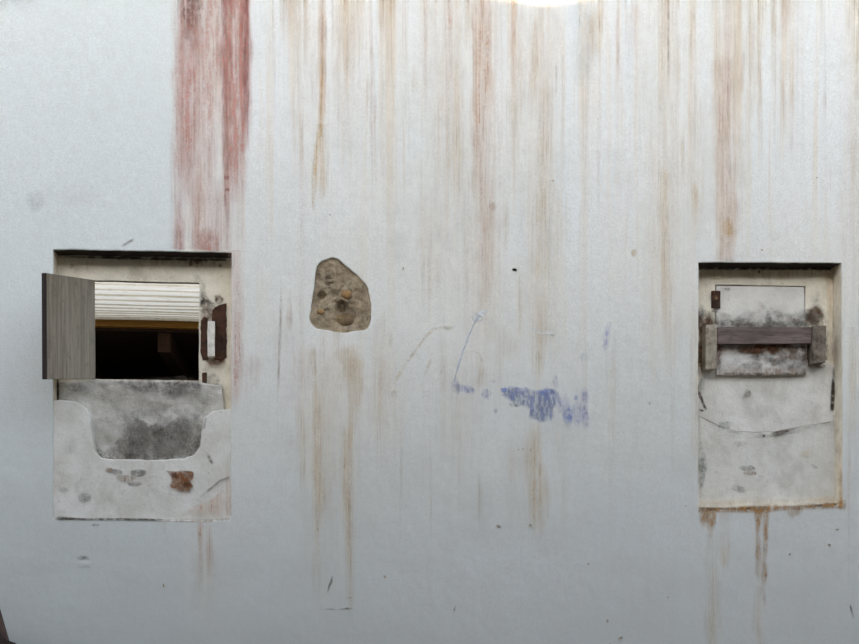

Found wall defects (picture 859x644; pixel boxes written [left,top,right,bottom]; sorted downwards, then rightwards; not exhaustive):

corrosion [222,0,248,204]
flaking render [309,258,371,333]
leakage [698,311,816,327]
crack [760,429,795,437]
corrosion [167,471,193,491]
corrosion [702,506,786,540]